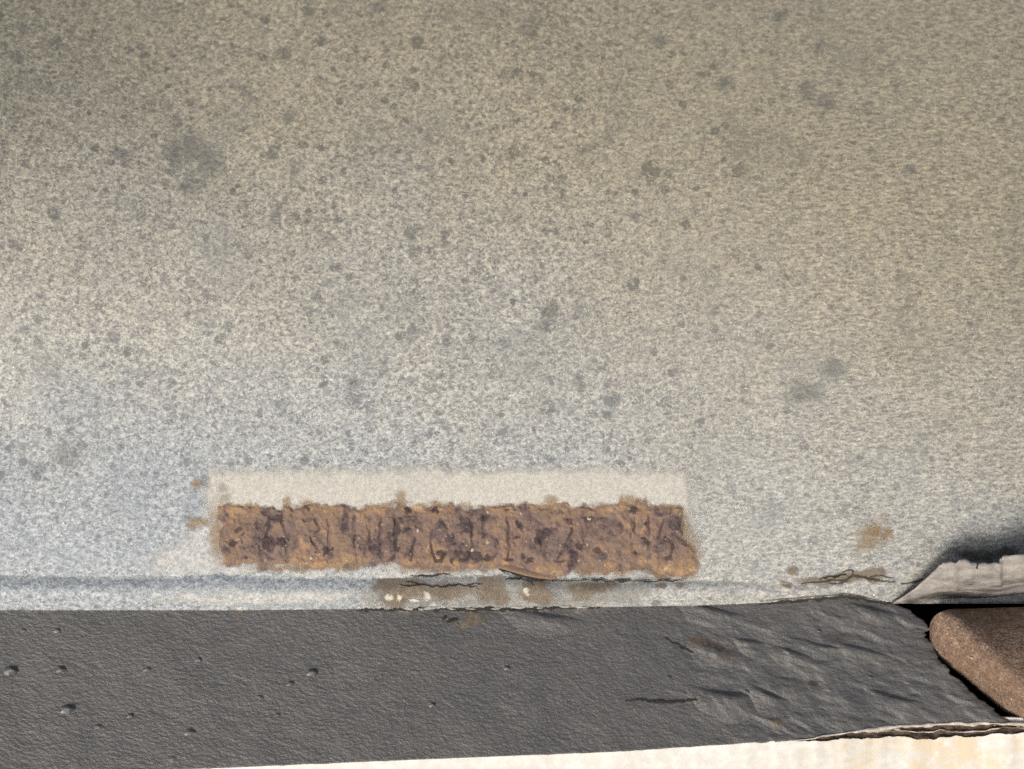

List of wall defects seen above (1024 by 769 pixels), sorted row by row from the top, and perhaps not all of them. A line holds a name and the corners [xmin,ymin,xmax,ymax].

rust [189,487,698,608]
crack [759,570,923,605]